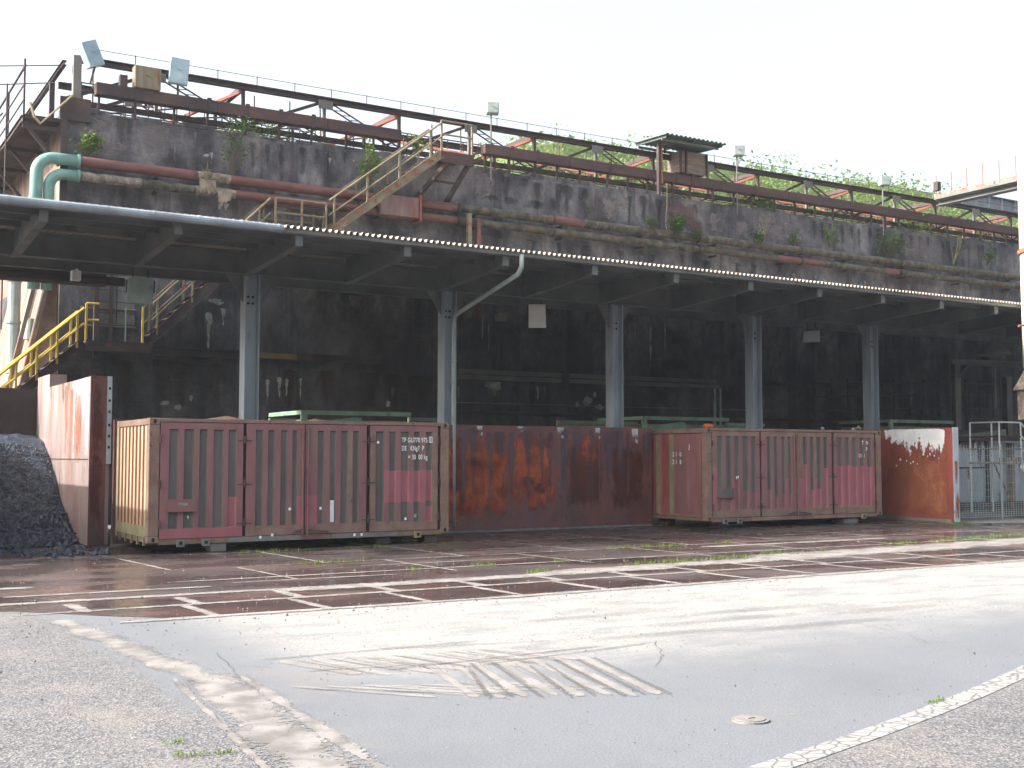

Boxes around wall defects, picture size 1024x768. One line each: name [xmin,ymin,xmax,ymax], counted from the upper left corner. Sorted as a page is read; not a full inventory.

water stain [205,297,226,348]
rust [65,386,103,518]
rust [449,435,554,522]
peeling [884,429,945,467]